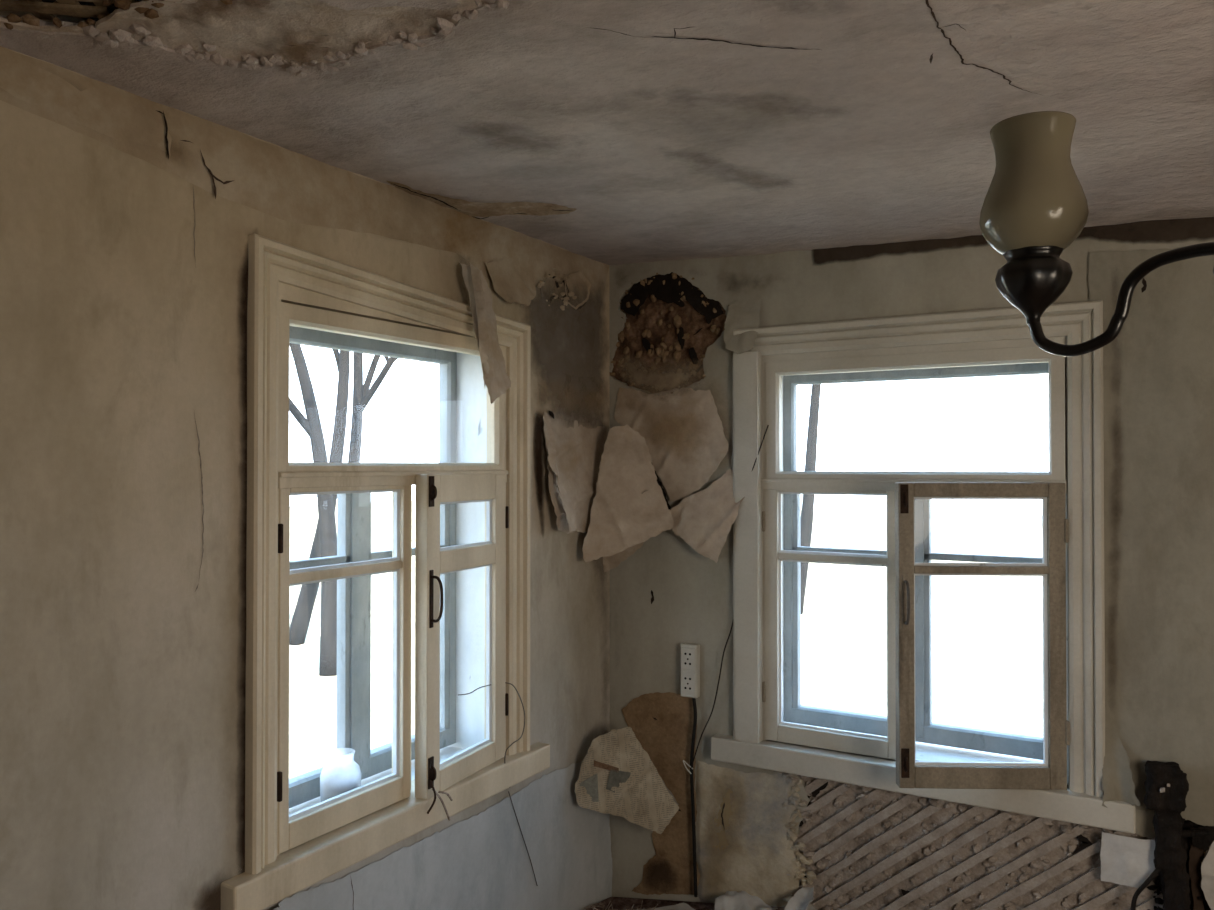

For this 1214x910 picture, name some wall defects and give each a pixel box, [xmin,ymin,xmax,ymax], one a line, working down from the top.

spalling [0,0,510,79]
crack [925,0,1041,95]
crack [156,110,234,267]
spalling [610,272,729,394]
spalling [776,771,1164,910]